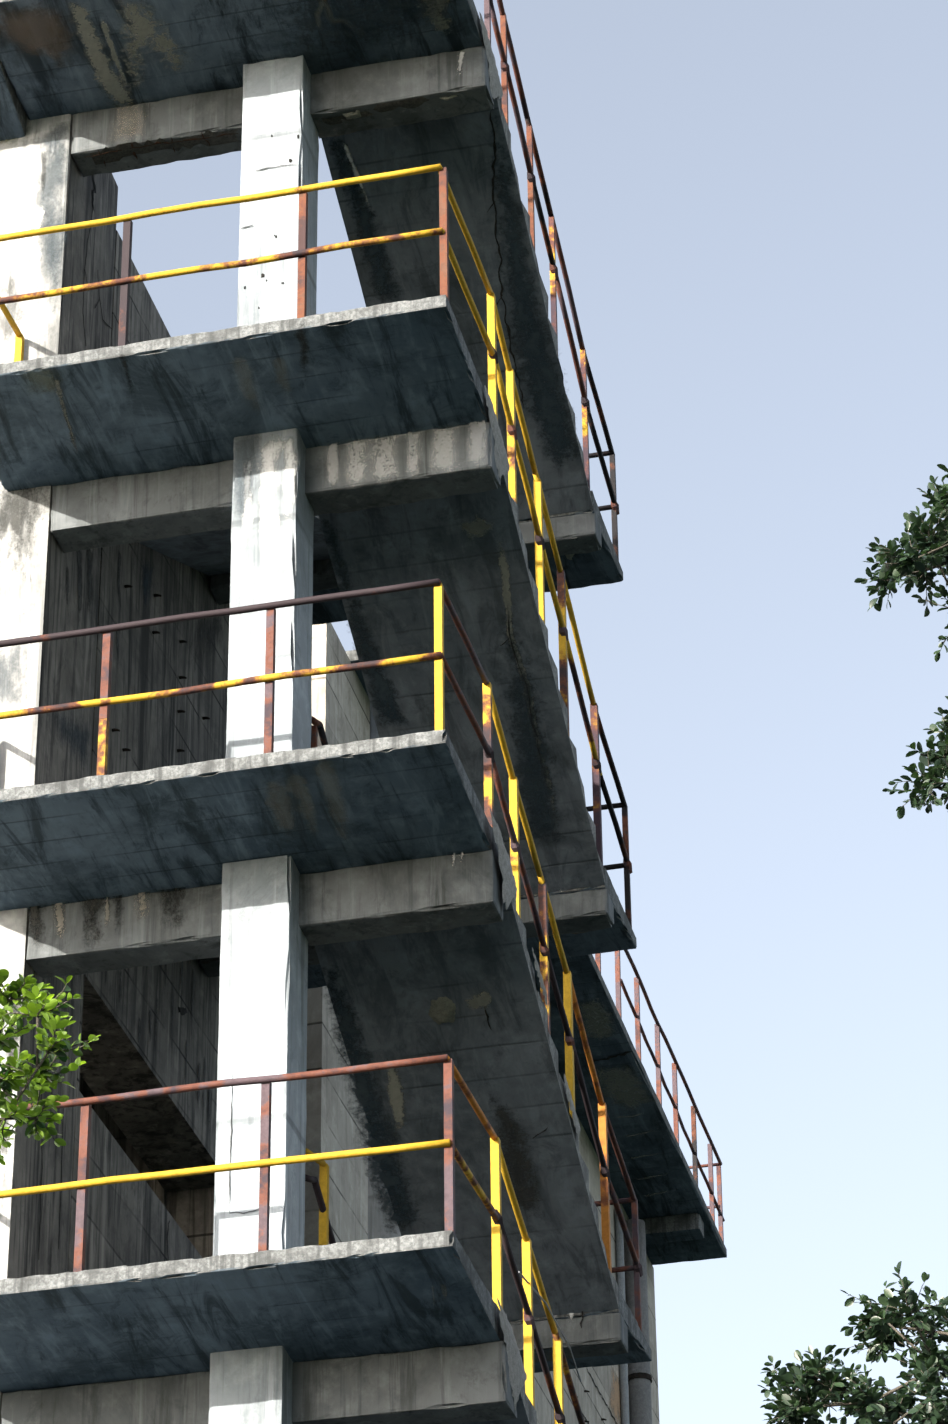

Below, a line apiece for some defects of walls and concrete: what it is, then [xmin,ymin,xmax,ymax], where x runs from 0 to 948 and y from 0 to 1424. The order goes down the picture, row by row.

damp [0,125,67,286]
damp [315,968,419,1233]
damp [491,1097,538,1210]